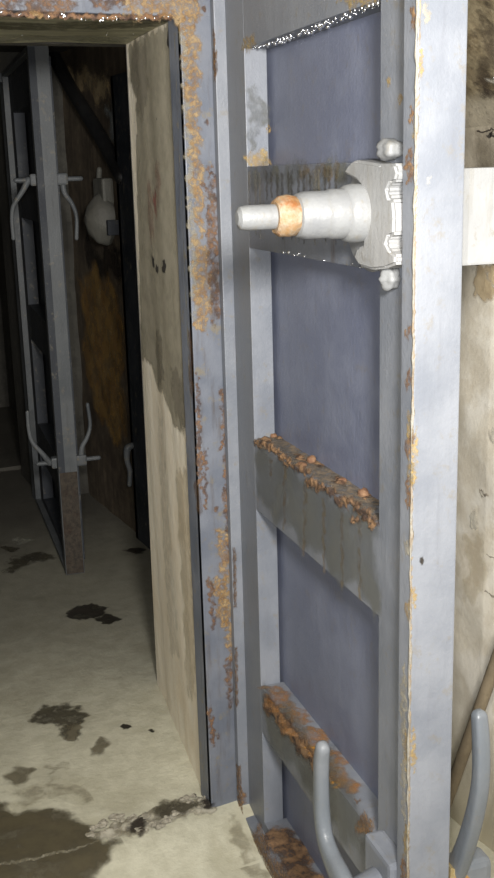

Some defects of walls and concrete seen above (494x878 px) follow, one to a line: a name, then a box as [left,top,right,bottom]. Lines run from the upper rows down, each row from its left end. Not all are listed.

rust [0,0,221,331]
rust [254,433,379,530]
rust [405,426,418,509]
rust [195,373,239,708]
water stain [66,603,121,624]
water stain [29,704,89,741]
rust [260,686,328,772]
rust [329,750,374,834]
water stain [0,803,118,878]
rust [252,823,325,878]